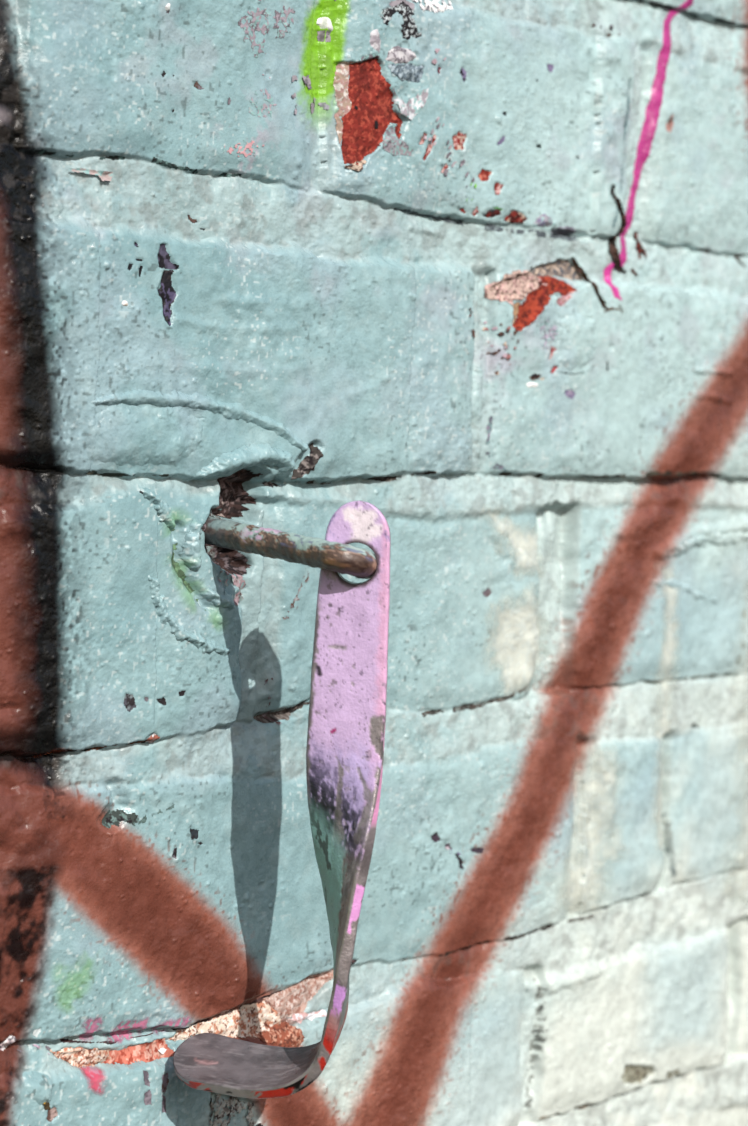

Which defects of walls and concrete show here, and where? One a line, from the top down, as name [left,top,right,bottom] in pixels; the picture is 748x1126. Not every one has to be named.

peeling [238,0,295,57]
peeling [223,140,265,157]
spalling [292,0,576,236]
crack [394,78,647,313]
spalling [469,259,584,388]
peeling [0,969,333,1113]